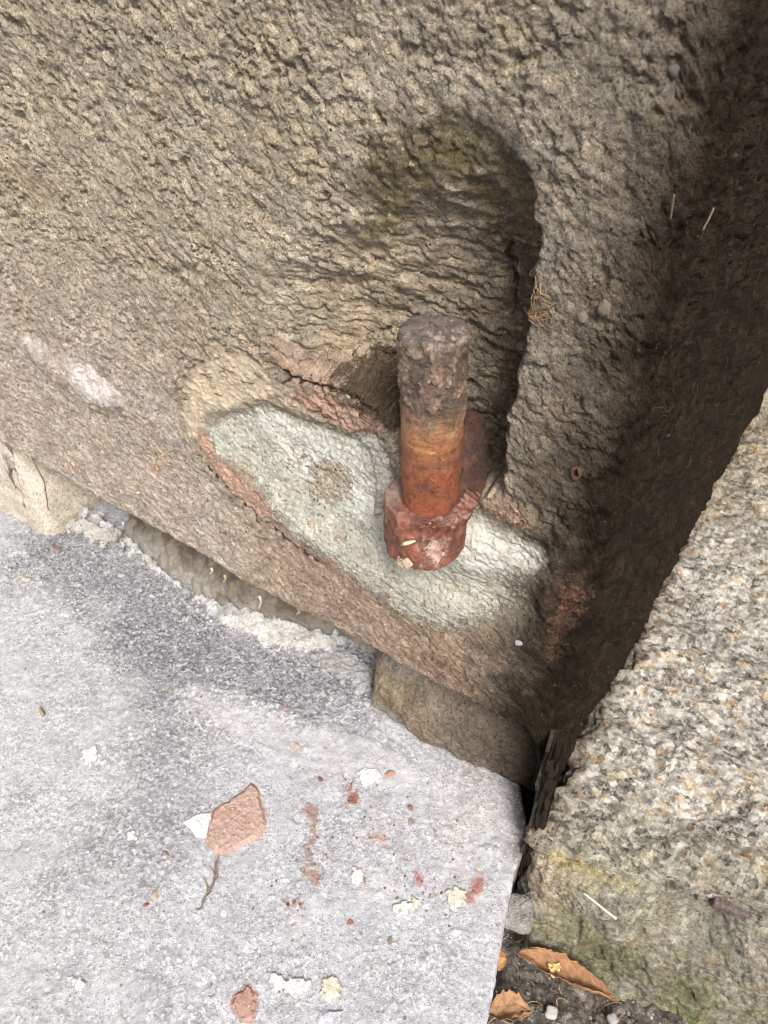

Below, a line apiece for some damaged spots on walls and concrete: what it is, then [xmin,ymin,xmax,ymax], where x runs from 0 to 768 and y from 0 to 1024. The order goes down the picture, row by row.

water stain [352,89,541,245]
peeling [177,352,279,521]
peeling [292,387,385,438]
spalling [305,458,353,508]
rust [418,489,538,529]